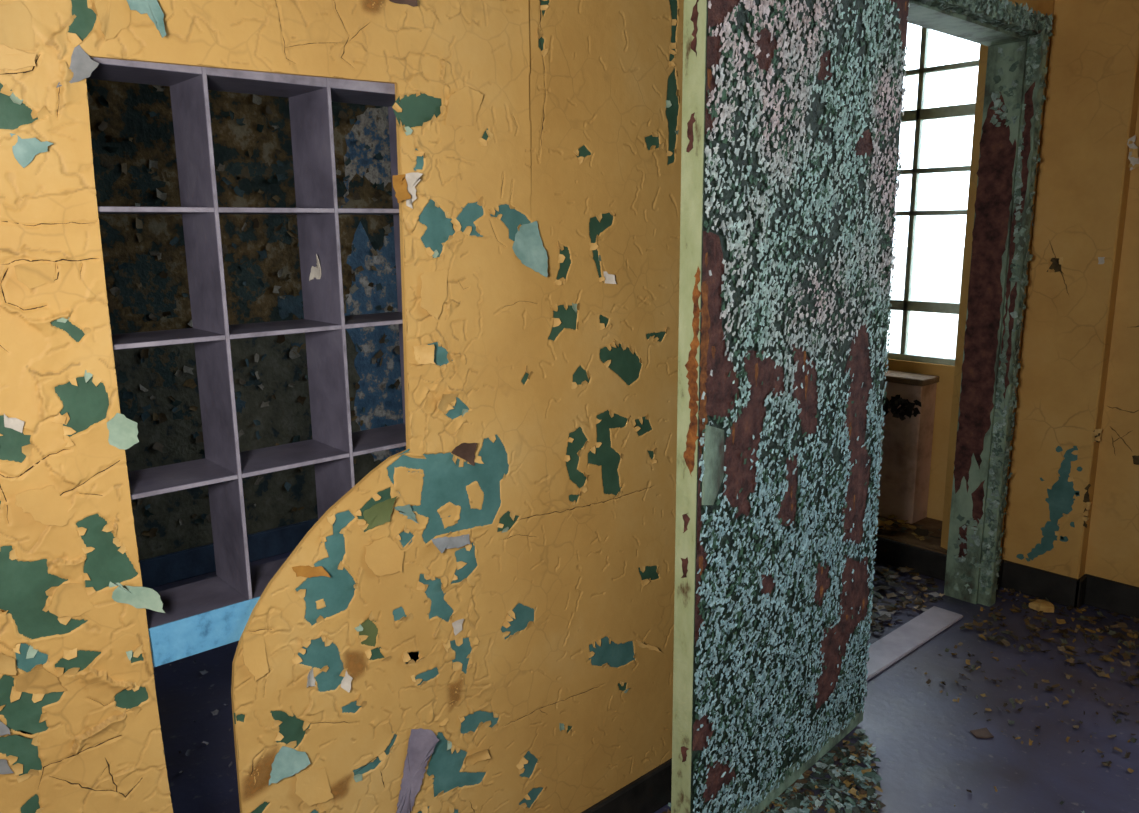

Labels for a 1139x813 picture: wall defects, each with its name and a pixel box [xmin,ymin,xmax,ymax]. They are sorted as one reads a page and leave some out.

rust [686,0,740,153]
crack [0,449,67,523]
crack [0,258,97,310]
peeling [0,514,165,783]
crack [60,460,120,496]
crack [38,735,142,798]
peeling [291,433,519,713]
peeling [332,91,571,431]
rust [681,231,818,649]
rust [812,320,872,710]
peeling [693,0,1053,813]
rust [953,82,1035,560]